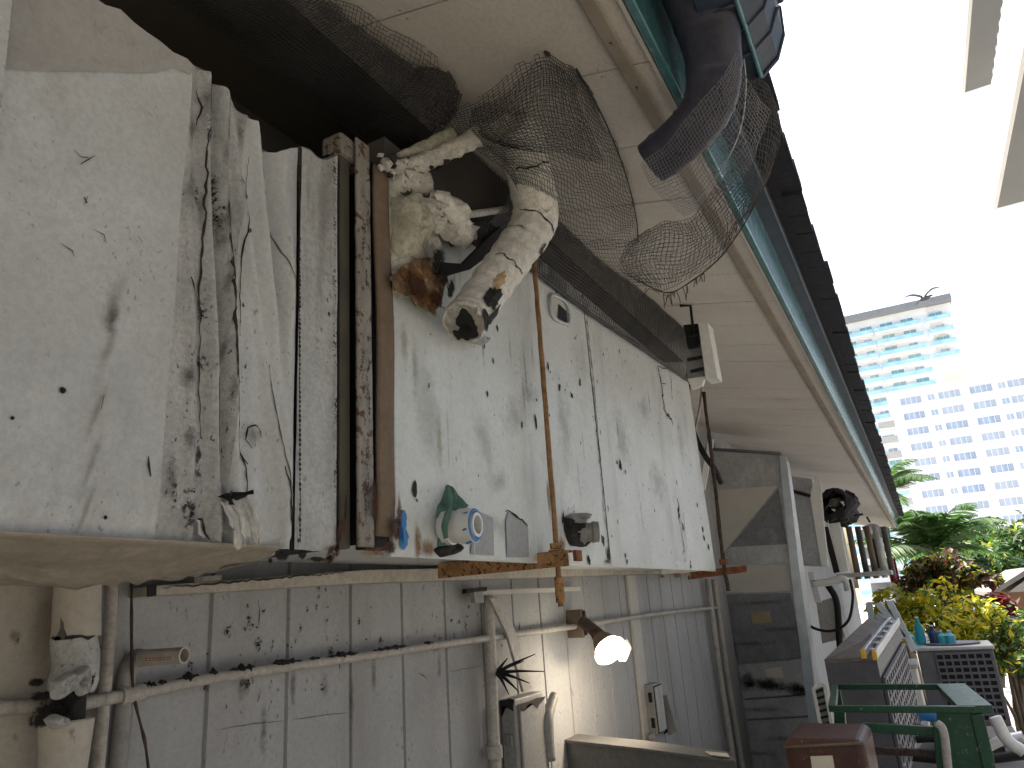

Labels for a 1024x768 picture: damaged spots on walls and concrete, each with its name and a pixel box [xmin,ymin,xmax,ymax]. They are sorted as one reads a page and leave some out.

crack [191,88,296,497]
crack [269,364,293,546]
rust [363,498,402,555]
rust [416,533,433,556]